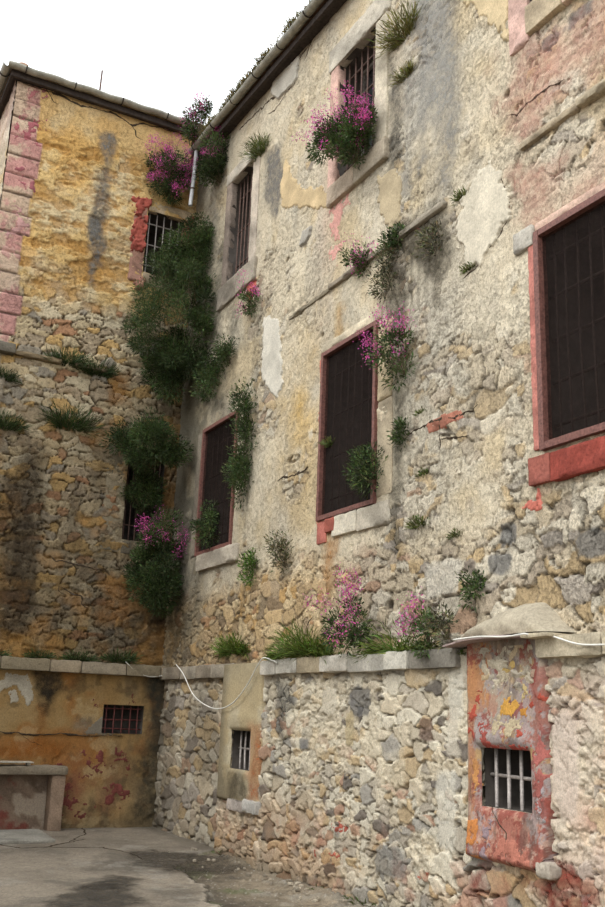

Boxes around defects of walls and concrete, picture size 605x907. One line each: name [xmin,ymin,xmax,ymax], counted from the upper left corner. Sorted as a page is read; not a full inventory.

spalling [463,0,509,42]
water stain [89,178,108,274]
peeling [129,196,152,253]
spalling [280,159,352,266]
spalling [455,160,512,269]
spalling [261,315,284,398]
spalling [426,410,465,433]
peeling [0,673,34,706]
crack [0,731,121,746]
peeling [467,660,553,823]
peeling [62,747,132,819]
peeling [466,817,531,888]